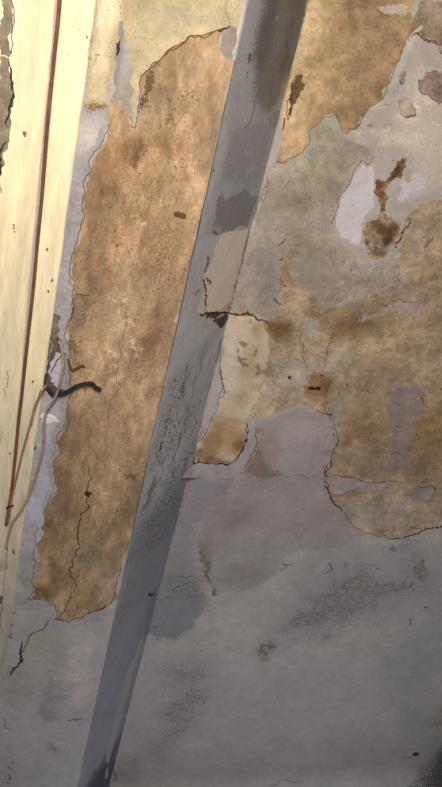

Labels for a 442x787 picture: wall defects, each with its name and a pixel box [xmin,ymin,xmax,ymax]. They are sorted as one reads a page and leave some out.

peeling [271,0,442,168]
peeling [335,163,375,247]
rust [363,156,411,260]
peeling [394,169,431,205]
crack [104,300,129,451]
peeling [14,21,237,630]
crack [10,465,92,676]
peeling [77,199,442,787]